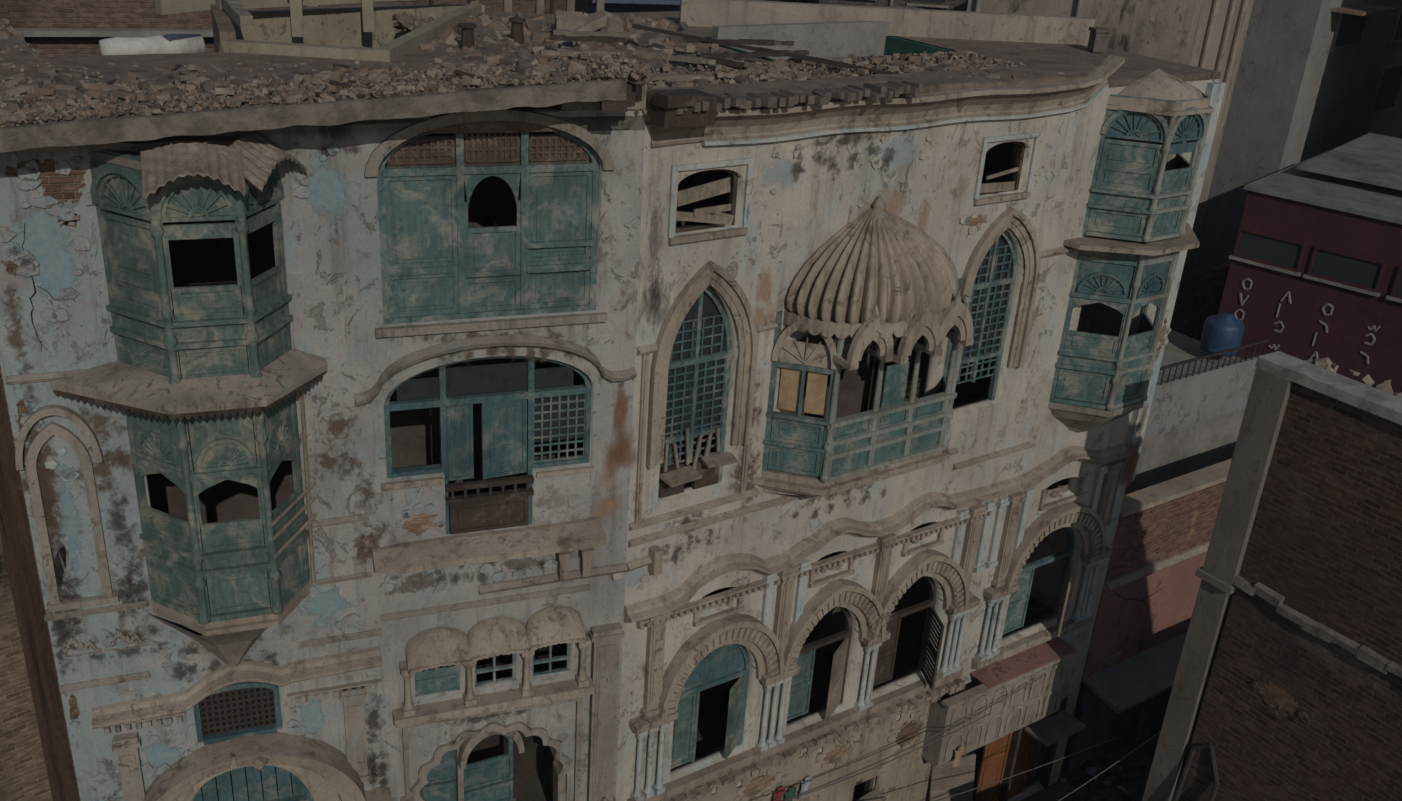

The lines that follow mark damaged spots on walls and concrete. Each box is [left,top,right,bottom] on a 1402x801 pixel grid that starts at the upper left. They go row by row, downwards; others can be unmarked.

leakage [5,289,36,401]
crack [22,223,68,352]
peeling [0,153,94,322]
leakage [20,434,81,671]
leakage [77,407,133,547]
leakage [91,564,220,682]
flaking render [379,569,447,595]
flaking render [396,502,446,537]
rust [608,394,633,465]